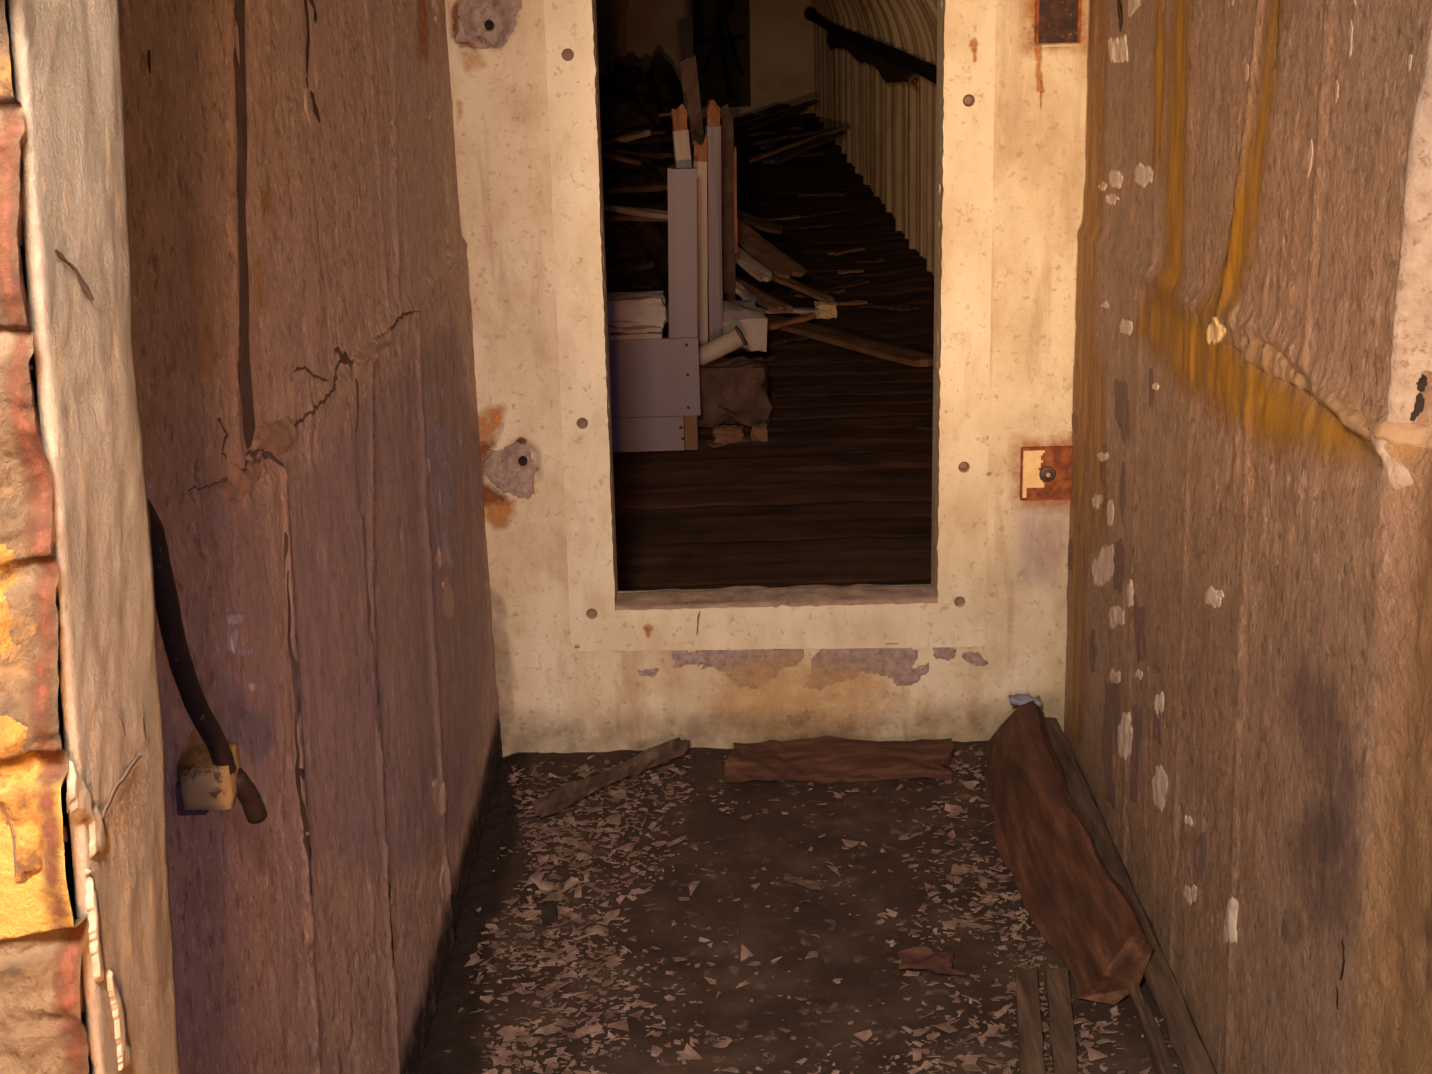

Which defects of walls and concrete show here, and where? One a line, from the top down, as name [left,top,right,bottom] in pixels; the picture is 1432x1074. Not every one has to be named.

crack [54,249,94,300]
crack [188,0,289,492]
crack [304,0,321,123]
crack [294,310,421,748]
spalling [432,0,522,50]
spalling [481,441,539,499]
peeling [638,643,988,691]
corrosion [1018,0,1105,746]
peeling [1089,379,1168,813]
peeling [1206,315,1226,345]
water stain [1137,0,1414,491]
water stain [1386,29,1432,423]